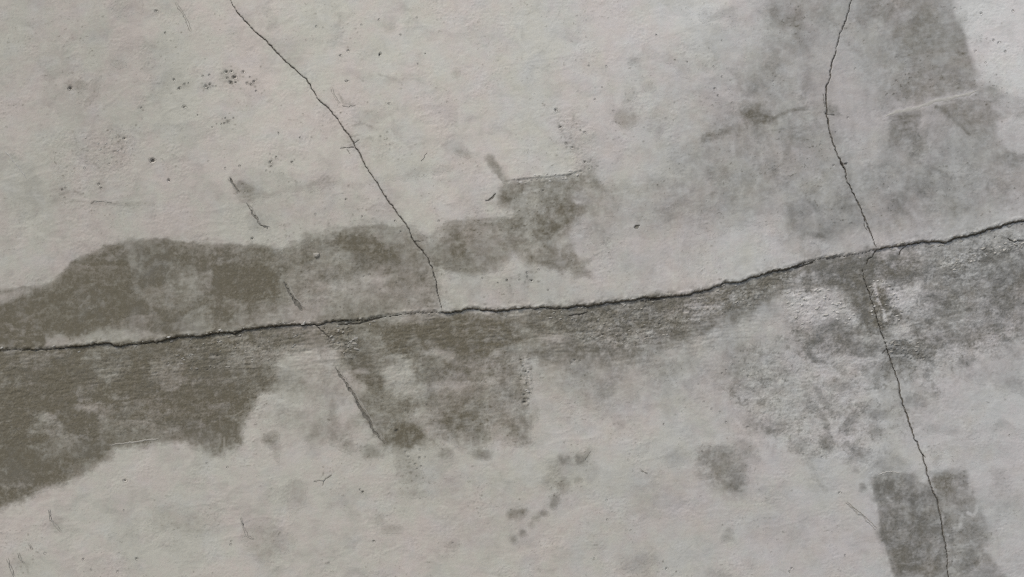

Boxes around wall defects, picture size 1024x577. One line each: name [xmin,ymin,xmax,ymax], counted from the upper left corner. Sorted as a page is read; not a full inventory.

damp [233,176,337,232]
damp [414,0,1024,280]
crack [50,317,381,353]
damp [0,222,1024,514]
crack [231,0,1024,577]
damp [241,524,297,563]
damp [505,447,593,544]
damp [847,423,1024,577]